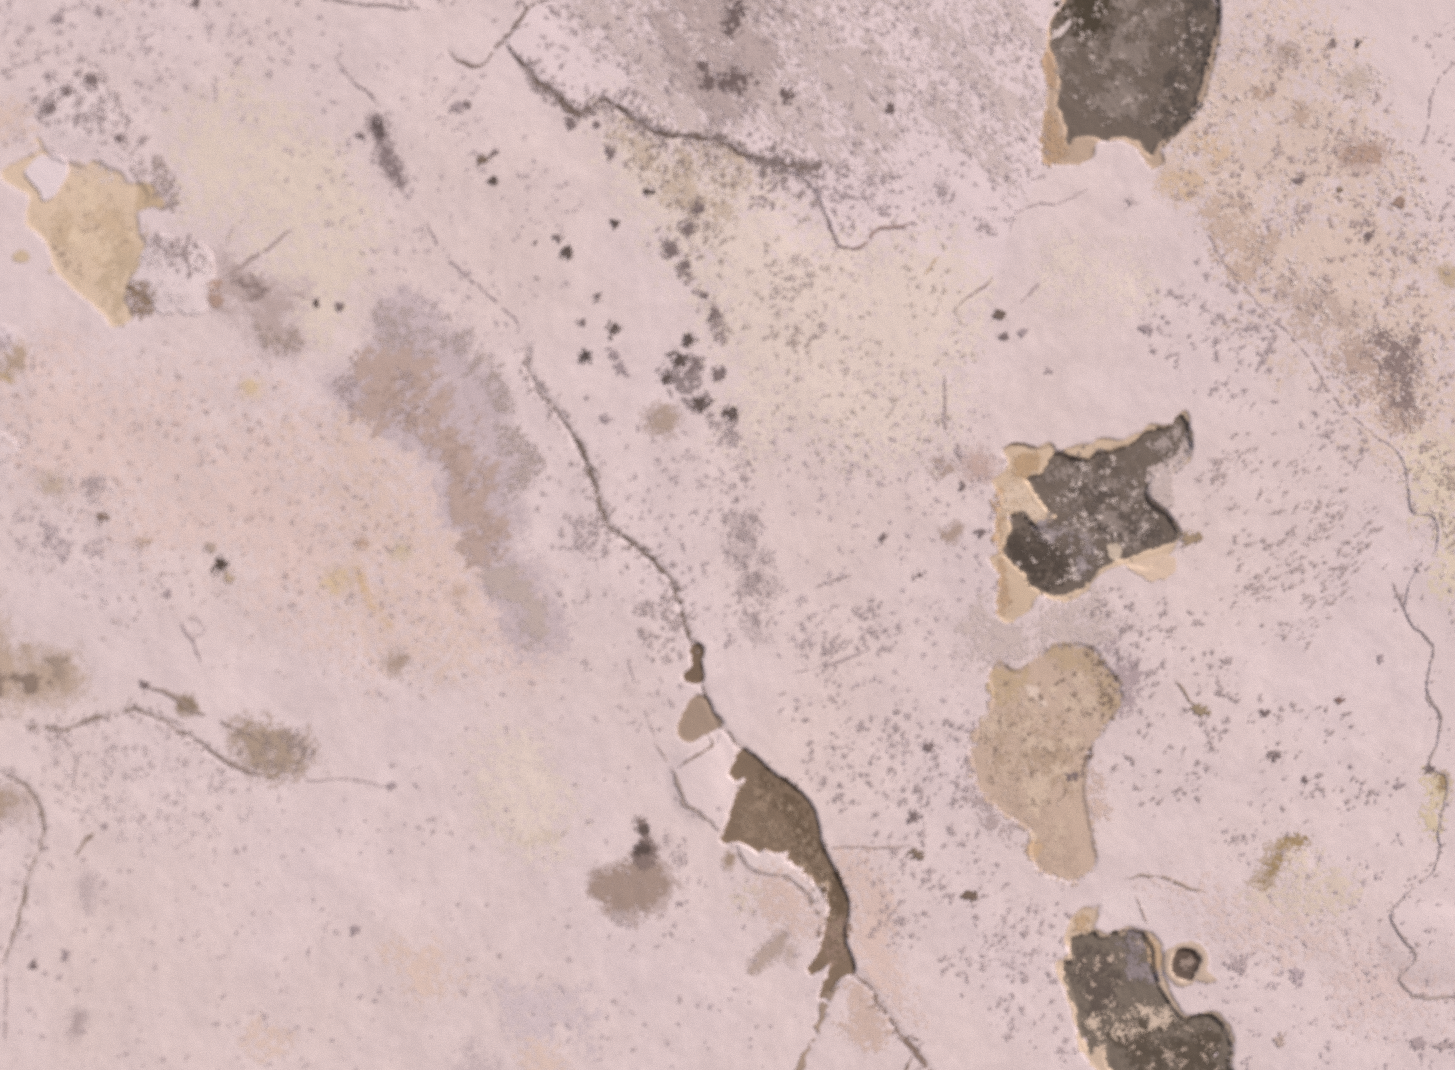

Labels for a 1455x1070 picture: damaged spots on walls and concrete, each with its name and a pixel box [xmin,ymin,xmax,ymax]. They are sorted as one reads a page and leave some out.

leakage [475,149,500,185]
leakage [534,232,573,260]
crack [448,0,914,250]
peeling [508,0,1222,307]
crack [427,222,707,647]
leakage [936,518,987,548]
spalling [989,410,1193,623]
crack [25,687,388,792]
peeling [967,641,1126,887]
leakage [954,584,1247,842]
crack [796,973,931,1070]
spalling [1055,906,1235,1070]